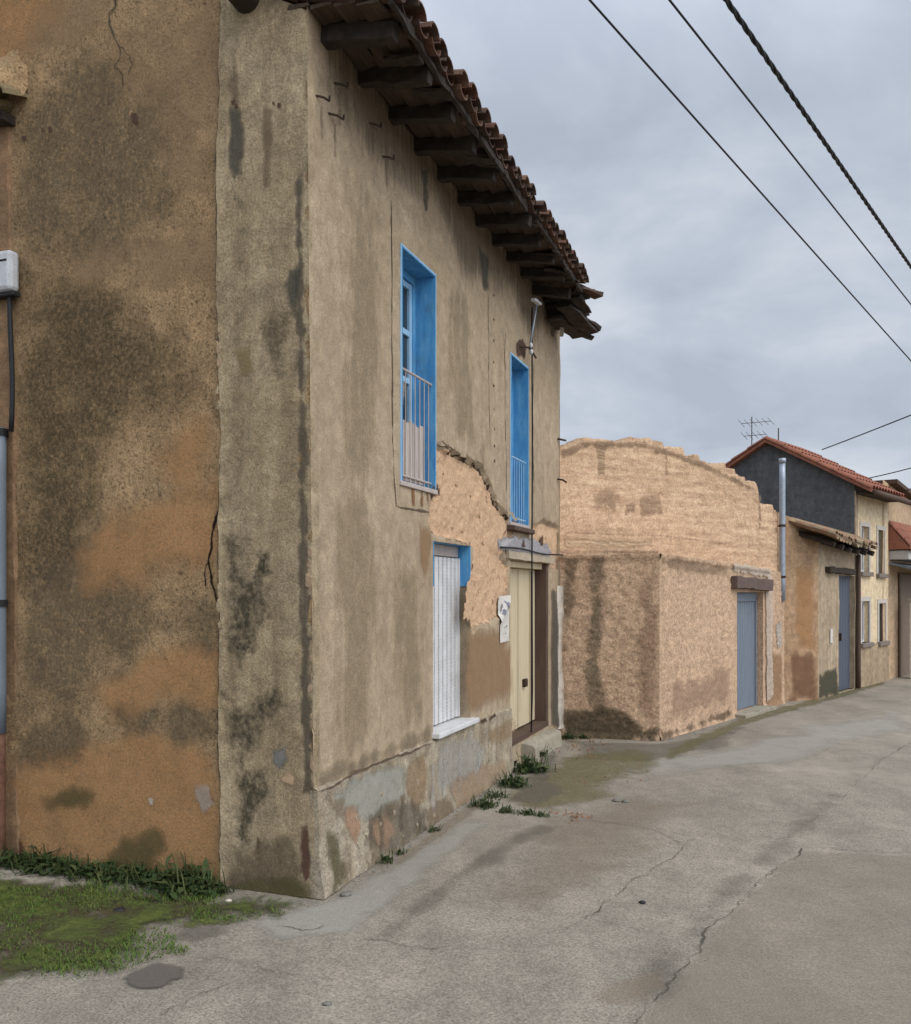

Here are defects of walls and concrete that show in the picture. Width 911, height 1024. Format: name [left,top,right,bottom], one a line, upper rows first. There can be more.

crack [108,0,132,88]
crack [214,1,222,417]
leakage [230,110,244,175]
leakage [17,290,174,705]
leakage [264,179,376,791]
spalling [428,449,557,628]
crack [204,443,226,862]
leakage [552,558,731,741]
peeling [334,799,404,848]
peeling [407,756,507,827]